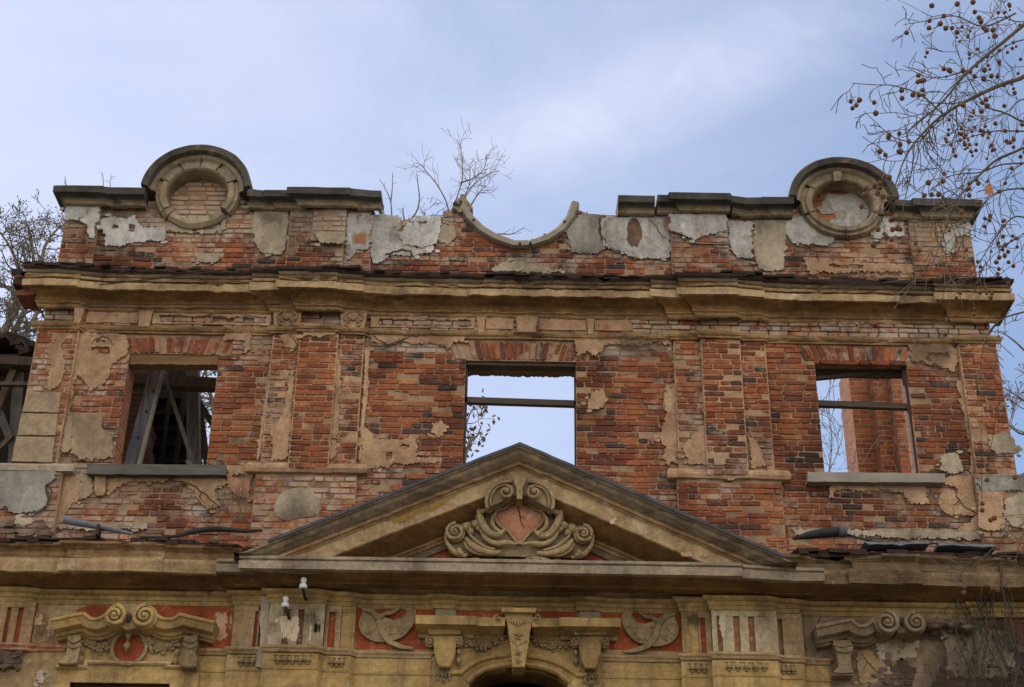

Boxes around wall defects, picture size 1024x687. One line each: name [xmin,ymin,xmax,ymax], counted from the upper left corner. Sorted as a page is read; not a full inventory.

flaking render [59,206,227,247]
flaking render [251,210,289,257]
flaking render [313,210,456,264]
flaking render [489,257,565,287]
flaking render [565,212,914,275]
flaking render [940,221,973,255]
flaking render [0,332,148,538]
flaking render [329,356,342,460]
flaking render [357,335,469,477]
flaking render [573,338,726,466]
flaking render [829,336,1024,542]
peeling [853,618,1024,687]